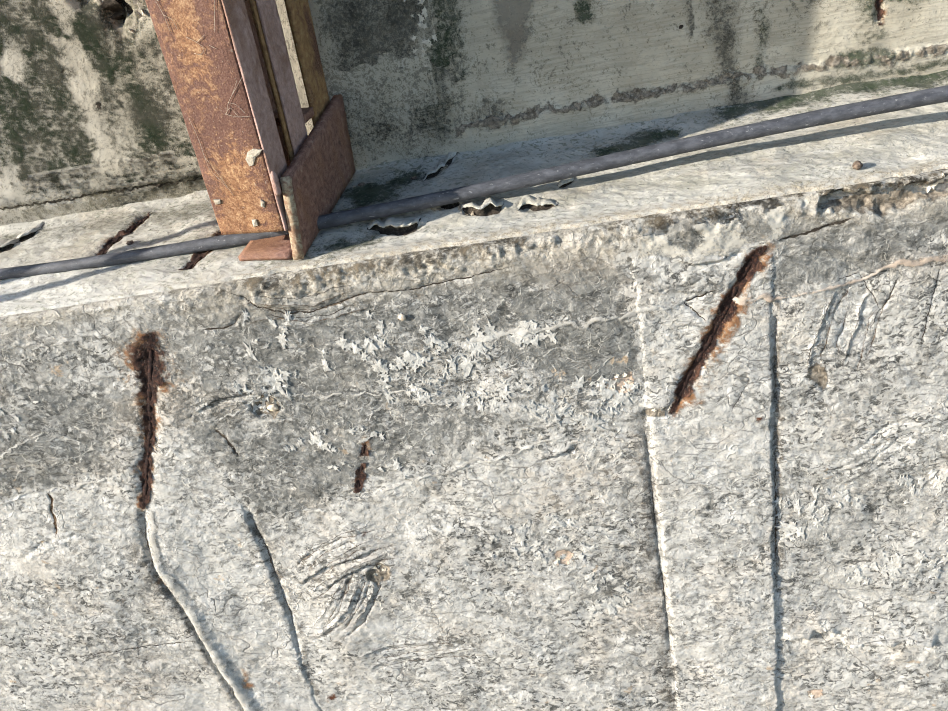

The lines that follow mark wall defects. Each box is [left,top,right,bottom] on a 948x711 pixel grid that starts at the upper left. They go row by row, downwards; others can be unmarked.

damp [494,0,533,66]
rust [875,0,887,25]
peeling [0,221,44,252]
peeling [367,215,421,236]
peeling [431,196,504,216]
peeling [517,194,558,211]
crack [204,267,507,330]
spalling [639,200,786,417]
peeling [335,309,638,432]
peeling [283,429,346,471]
rust [353,441,371,493]
peeling [345,426,386,444]